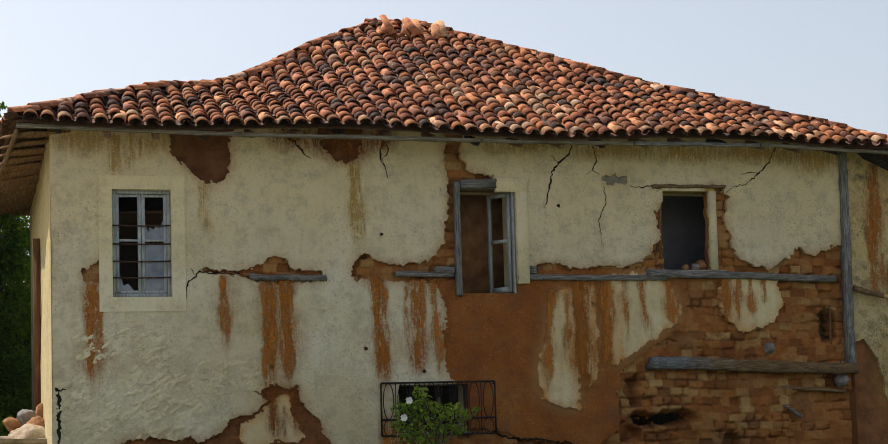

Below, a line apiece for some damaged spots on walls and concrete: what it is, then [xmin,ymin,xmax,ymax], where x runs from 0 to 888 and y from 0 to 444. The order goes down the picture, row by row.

spalling [169,129,233,184]
spalling [317,128,361,164]
crack [545,145,607,245]
crack [726,147,776,193]
spalling [202,256,322,285]
spalling [351,133,888,444]
crack [55,388,66,444]
spalling [121,383,331,444]